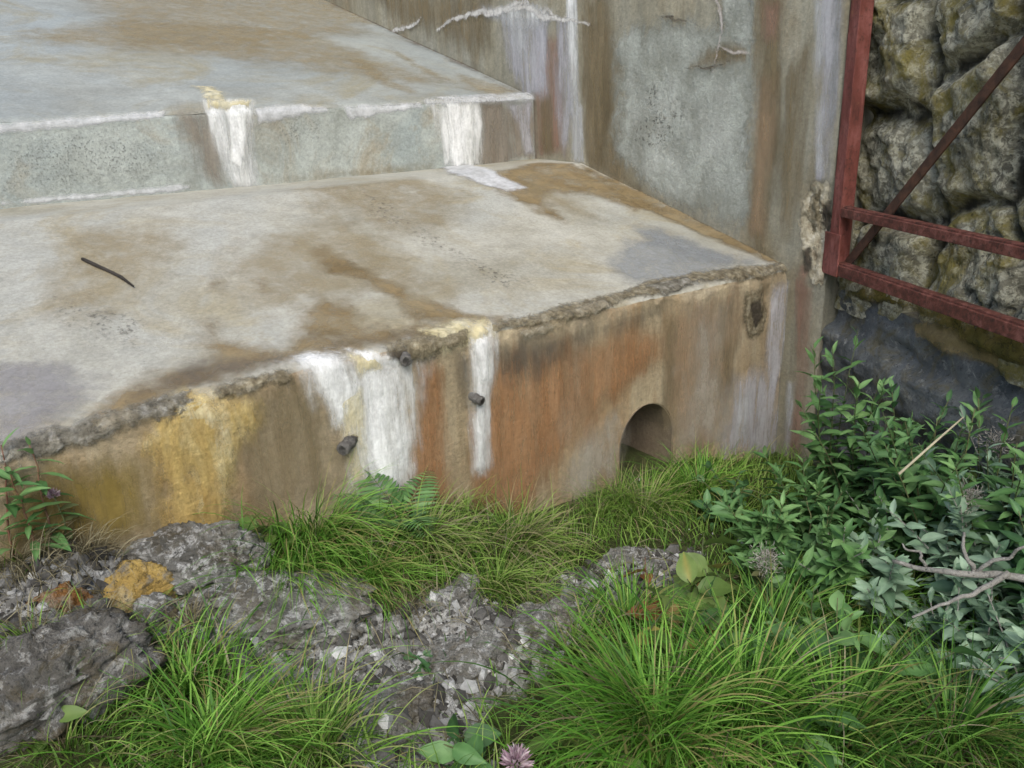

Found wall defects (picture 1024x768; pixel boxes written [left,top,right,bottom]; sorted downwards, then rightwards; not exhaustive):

crack [392,0,588,32]
crack [695,0,746,69]
water stain [183,86,254,187]
water stain [386,0,838,279]
spalling [798,180,831,285]
spalling [0,390,193,466]
spalling [216,369,291,399]
water stain [98,236,556,524]
spalling [386,328,468,362]
rust [409,368,446,500]
rust [476,344,587,515]
spalling [490,262,788,337]